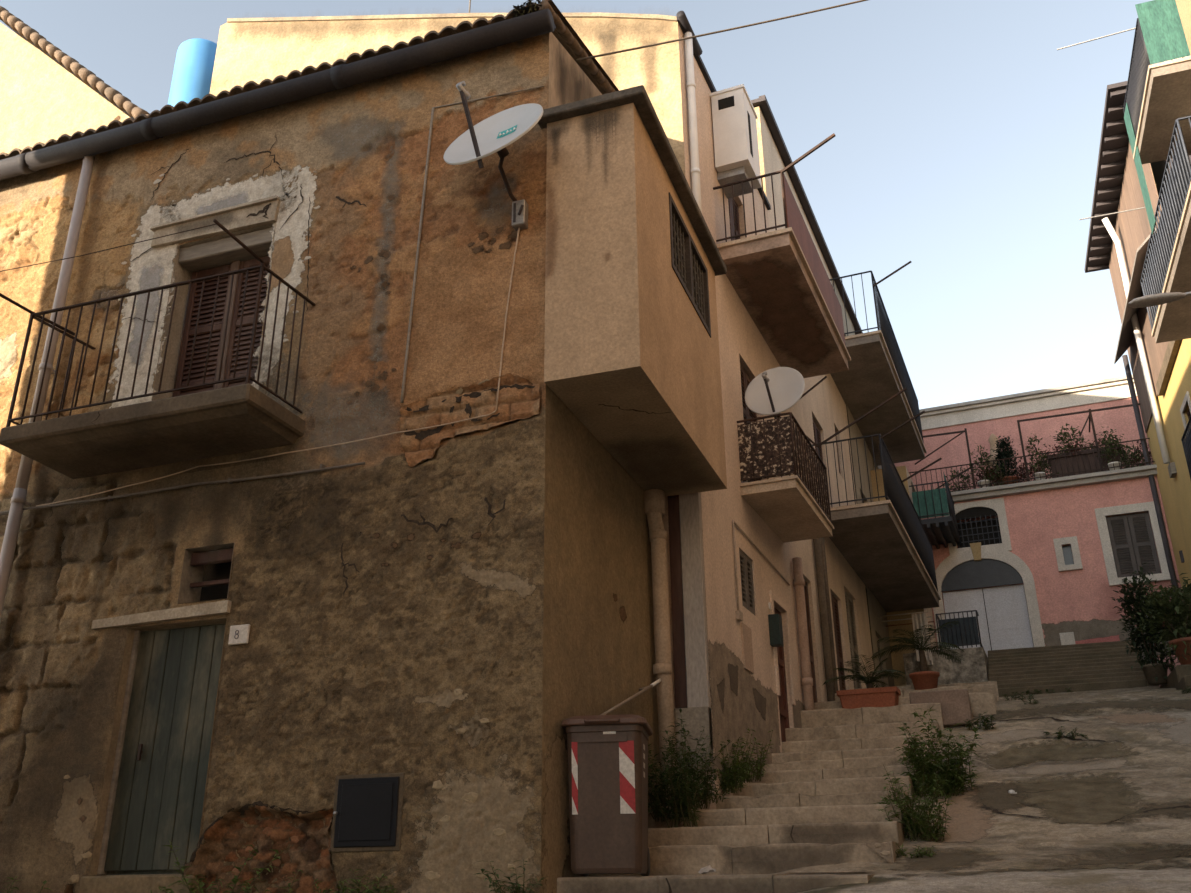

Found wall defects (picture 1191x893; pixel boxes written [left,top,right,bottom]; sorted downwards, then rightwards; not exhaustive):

crack [150,149,189,201]
crack [226,133,283,218]
peeling [106,165,320,409]
spalling [399,373,541,468]
spalling [183,801,338,893]